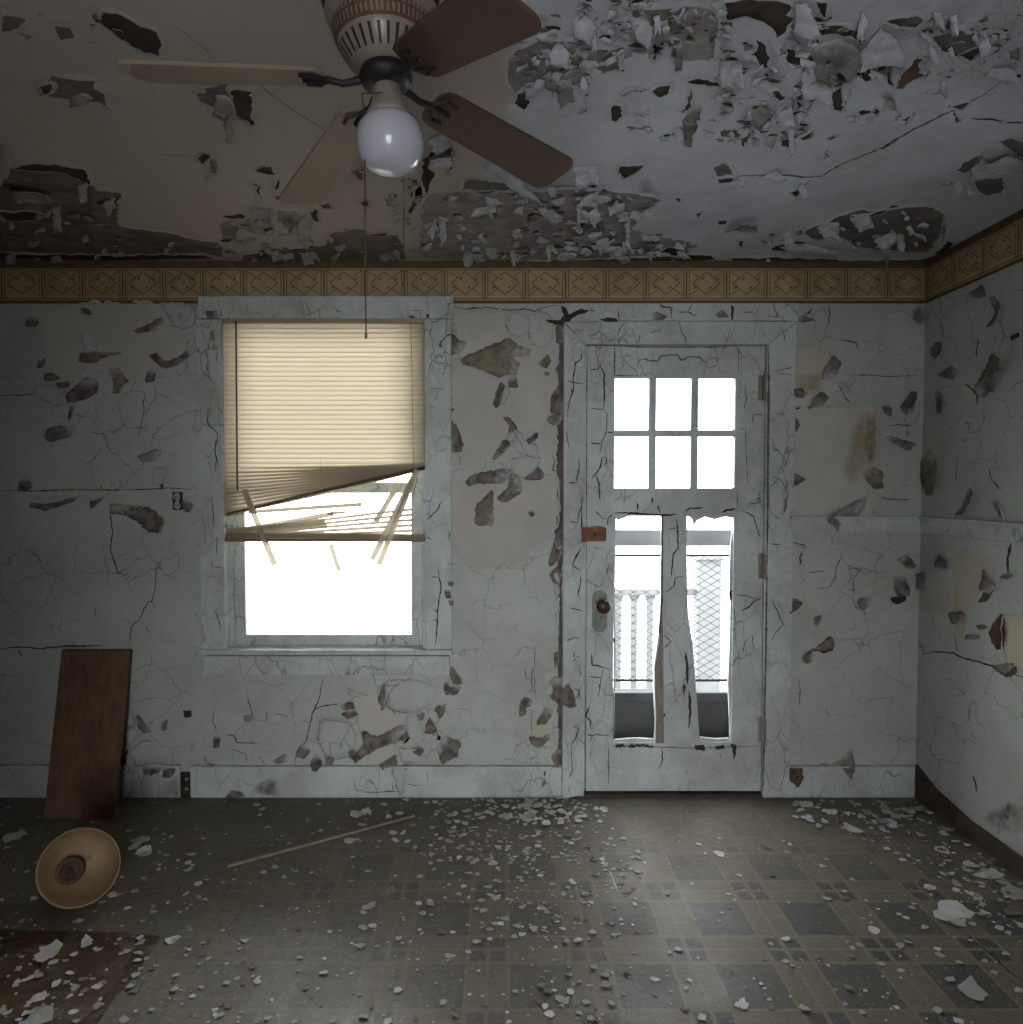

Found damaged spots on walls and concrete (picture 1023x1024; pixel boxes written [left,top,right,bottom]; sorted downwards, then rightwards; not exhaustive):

peeling [503,0,1023,161]
crack [719,75,1021,181]
peeling [0,134,955,268]
peeling [25,299,219,442]
crack [3,486,222,640]
crack [432,570,442,646]
peeling [438,306,617,787]
crack [552,303,859,652]
peeling [857,548,1023,678]
crack [205,677,357,765]
peeling [274,664,463,772]
crack [567,635,759,784]